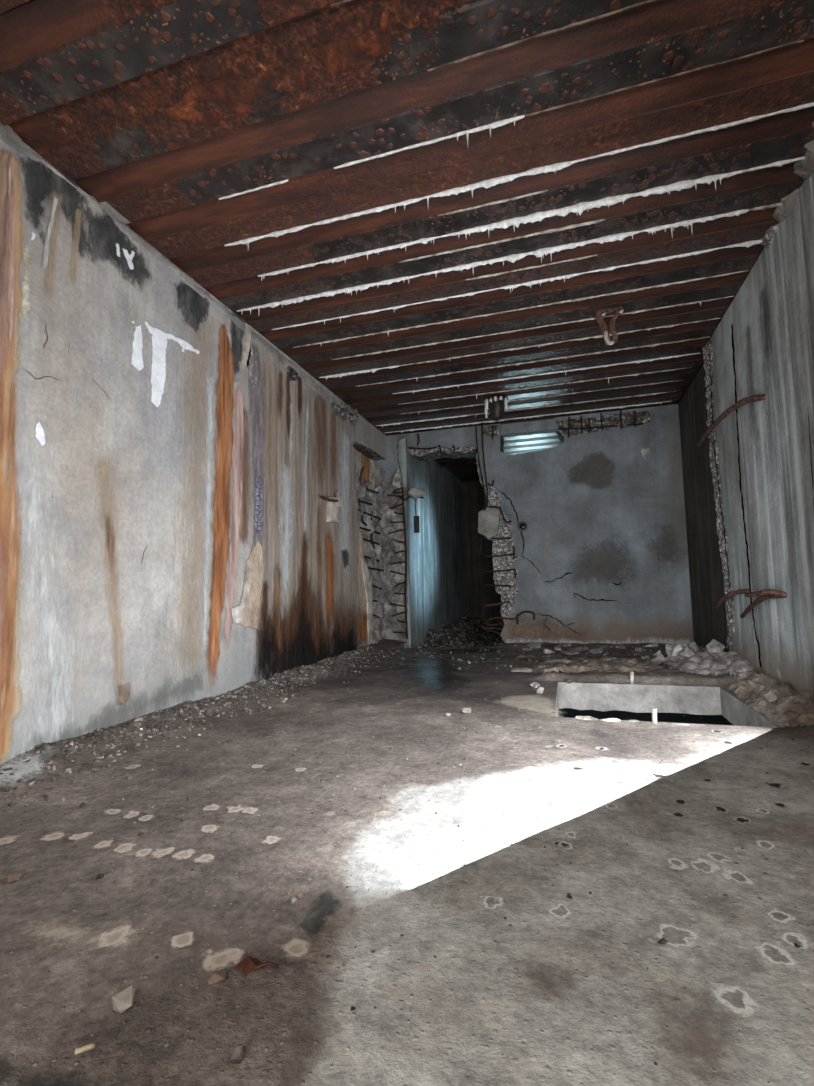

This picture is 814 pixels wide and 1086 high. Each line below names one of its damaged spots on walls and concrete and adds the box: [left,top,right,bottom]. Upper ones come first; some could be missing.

water stain [21,158,150,290]
water stain [177,282,209,331]
corrosion [0,151,31,761]
water stain [231,312,264,551]
water stain [255,406,358,679]
spalling [355,455,388,648]
spalling [476,454,535,635]
crack [497,489,622,634]
water stain [569,453,614,488]
spalling [556,410,650,438]
spalling [558,708,734,726]